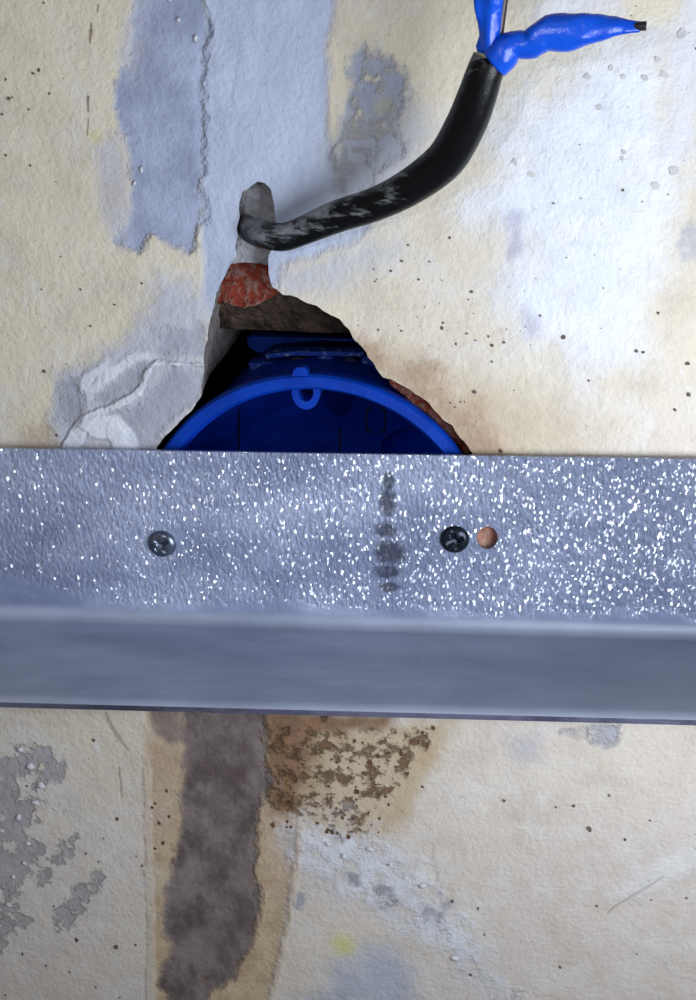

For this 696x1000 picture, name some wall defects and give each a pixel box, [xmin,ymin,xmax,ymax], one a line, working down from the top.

peeling [74,0,229,285]
spalling [239,181,276,222]
peeling [292,20,458,216]
peeling [157,197,430,450]
spalling [389,379,472,454]
spalling [477,527,497,547]
spalling [335,726,436,781]
peeling [0,707,186,1000]
water stain [127,711,311,1000]